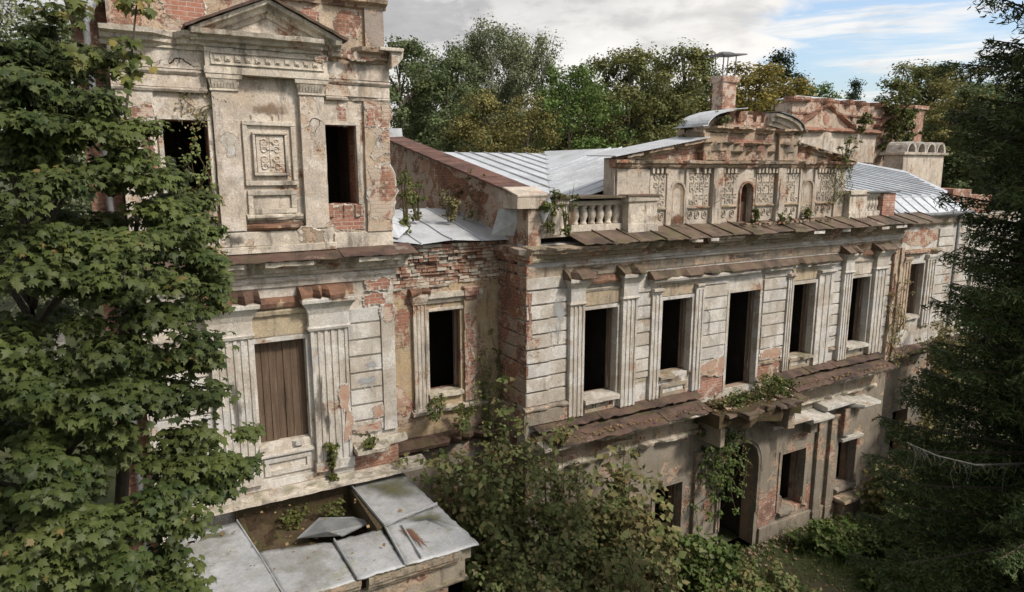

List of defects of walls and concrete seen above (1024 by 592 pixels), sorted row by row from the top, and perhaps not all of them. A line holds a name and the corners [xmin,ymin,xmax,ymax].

flaking render [132,0,207,24]
flaking render [296,6,379,62]
flaking render [297,100,399,244]
flaking render [362,275,412,350]
flaking render [500,278,533,343]
flaking render [695,355,725,400]
flaking render [753,347,782,387]
flaking render [337,383,384,442]